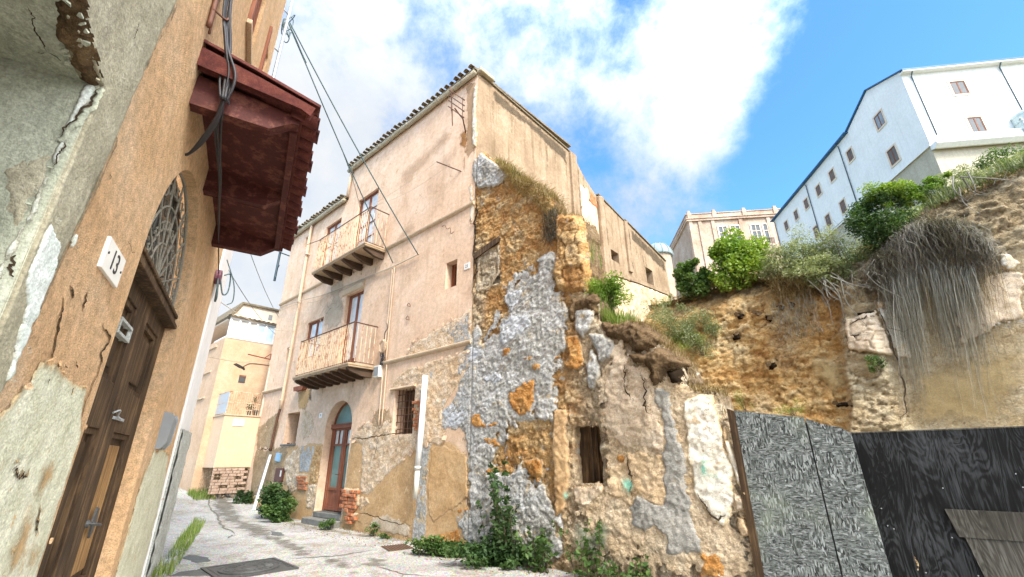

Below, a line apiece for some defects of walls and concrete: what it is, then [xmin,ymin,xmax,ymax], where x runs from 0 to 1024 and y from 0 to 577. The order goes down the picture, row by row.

crack [28,8,61,61]
flaking render [0,0,104,279]
peeling [0,217,89,577]
crack [48,283,112,418]
flaking render [339,251,756,577]
crack [623,365,653,415]